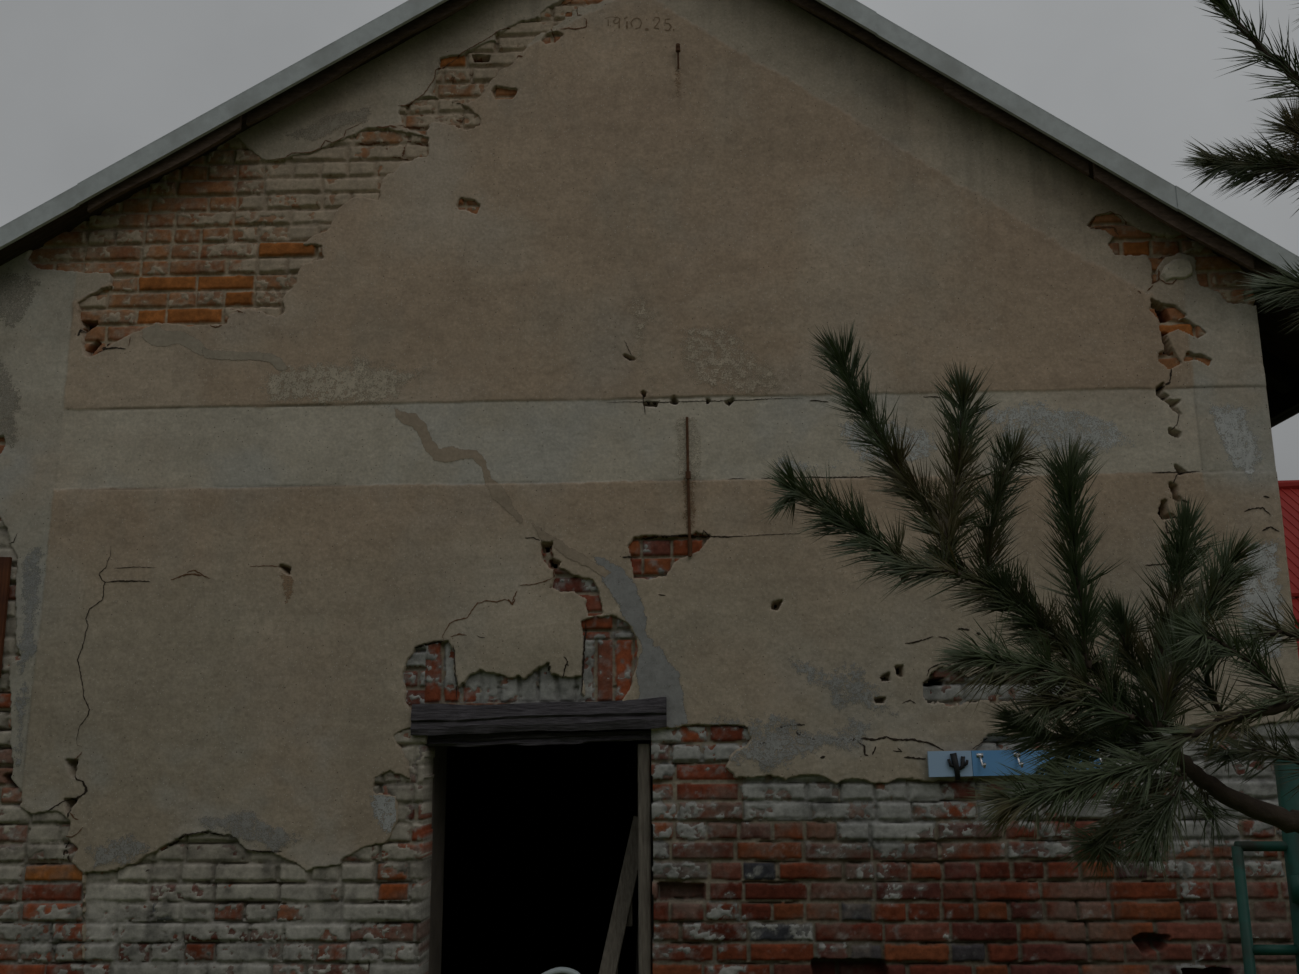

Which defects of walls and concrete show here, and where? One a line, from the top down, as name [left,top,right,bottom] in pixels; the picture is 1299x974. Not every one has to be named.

spalling [29,0,603,356]
spalling [1088,213,1255,306]
spalling [1150,306,1206,339]
spalling [1158,352,1211,369]
crack [48,551,208,862]
spalling [0,518,435,974]
spalling [403,546,638,709]
crack [395,409,800,699]
spalling [628,533,710,580]
spalling [923,668,1070,706]
spalling [651,720,1299,974]